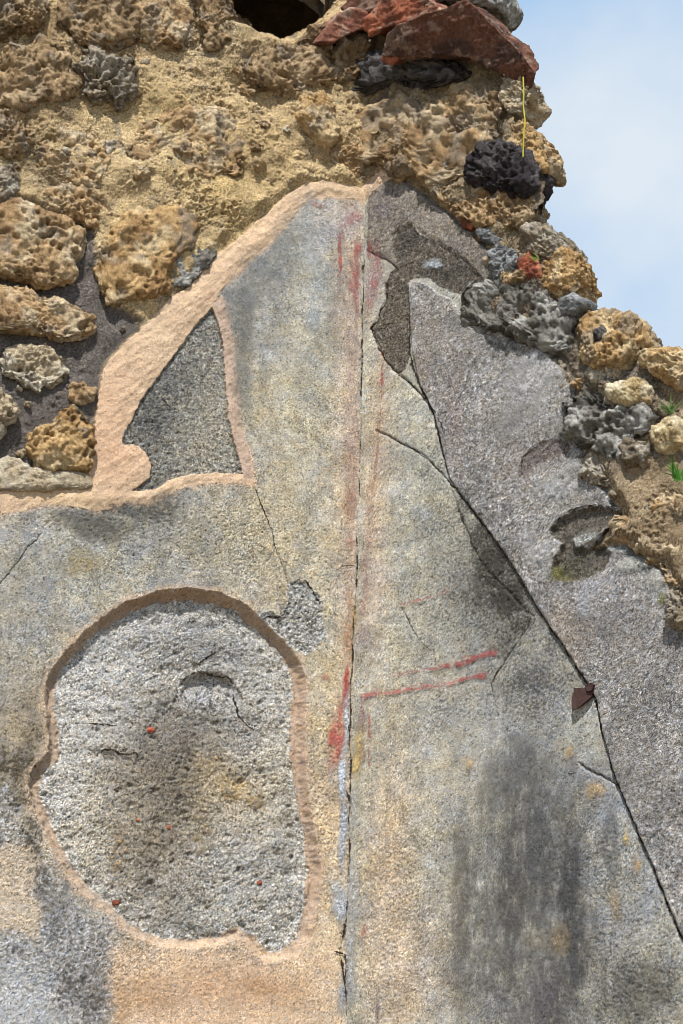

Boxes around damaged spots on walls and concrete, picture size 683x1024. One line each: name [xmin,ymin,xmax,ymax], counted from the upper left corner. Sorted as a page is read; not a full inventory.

spalling [232,0,324,39]
spalling [372,222,484,373]
spalling [122,300,243,491]
spalling [518,437,572,478]
crack [358,231,683,940]
crack [75,723,138,756]
spalling [29,580,325,964]
crack [177,651,254,730]
crack [334,536,358,1019]
leakage [452,743,595,1024]